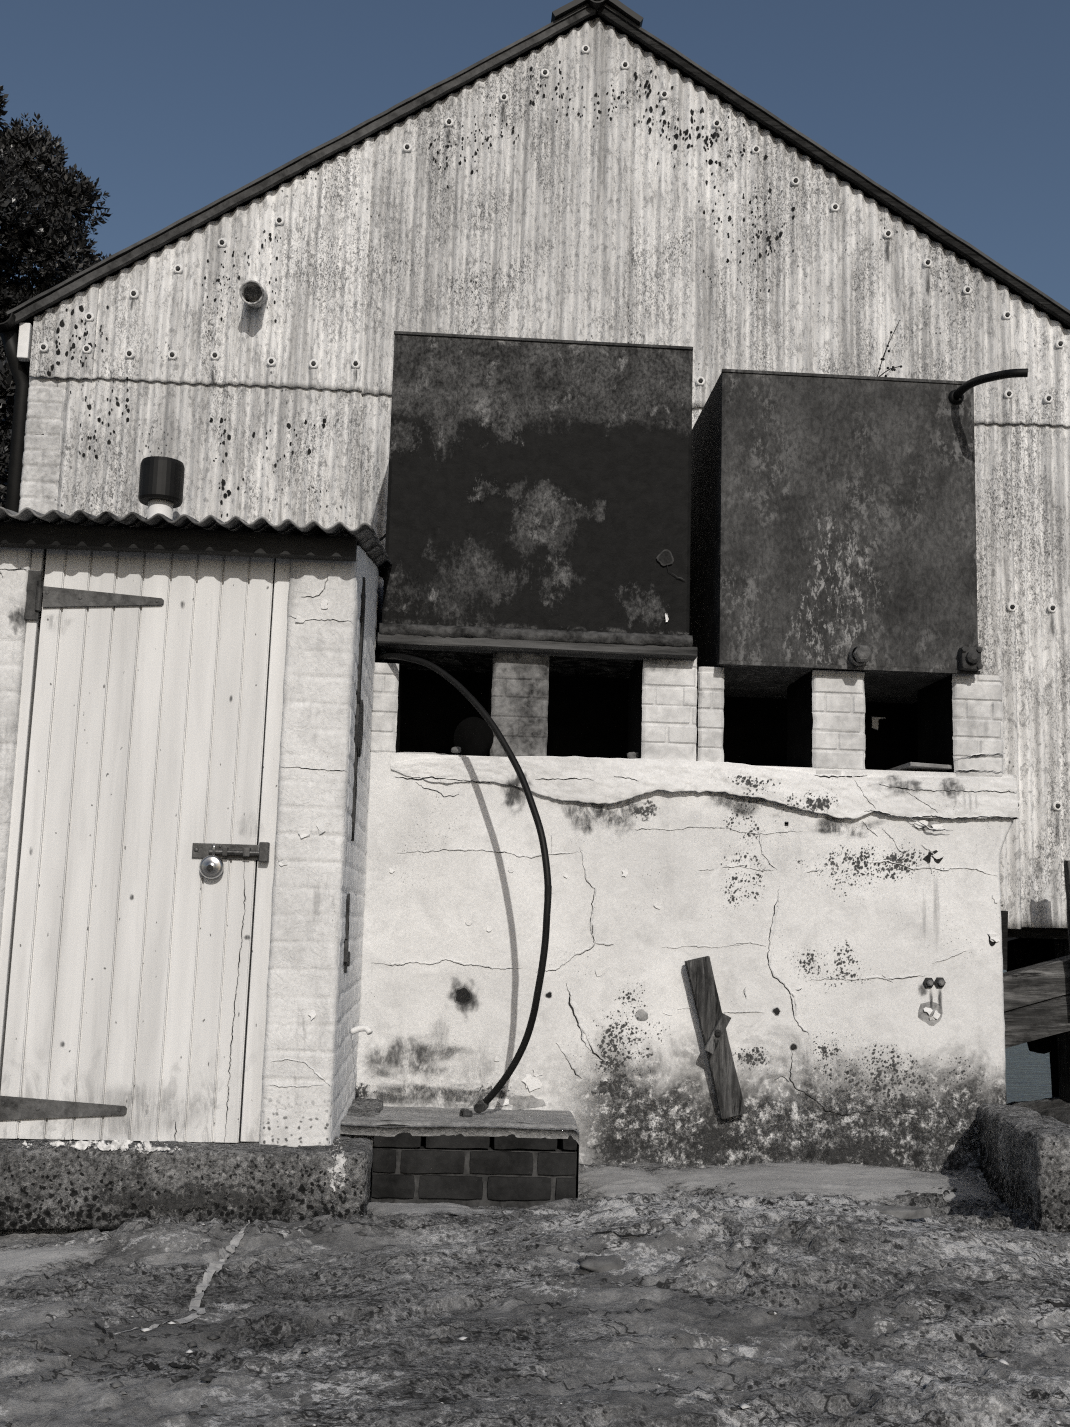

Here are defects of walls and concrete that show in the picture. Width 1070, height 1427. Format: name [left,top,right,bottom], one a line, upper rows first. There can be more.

crack [535,774,638,782]
crack [817,753,1017,876]
spalling [912,819,944,831]
peeling [923,850,945,868]
crack [371,835,614,1079]
crack [631,826,964,1127]
water stain [355,1083,377,1099]